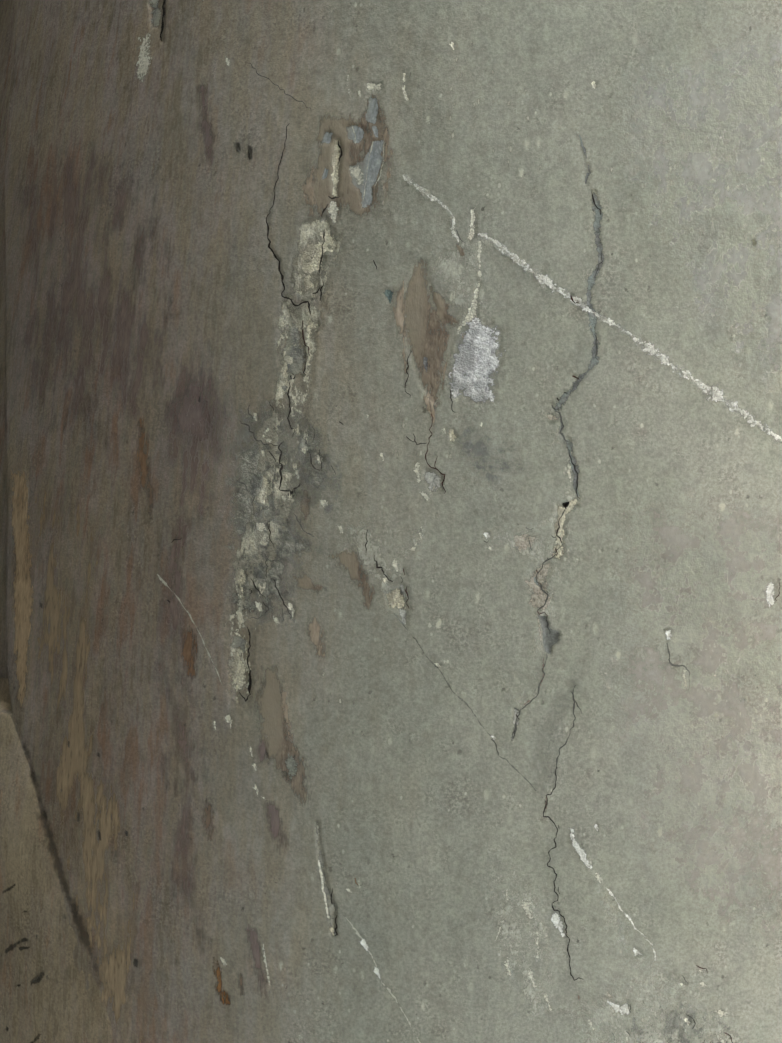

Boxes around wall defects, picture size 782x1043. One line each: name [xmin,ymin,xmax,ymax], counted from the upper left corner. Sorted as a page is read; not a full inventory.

spalling [136,0,166,82]
peeling [297,82,384,301]
crack [547,134,604,499]
peeling [227,315,328,624]
crack [406,397,457,494]
crack [536,547,561,613]
spalling [229,627,252,702]
crack [511,657,548,744]
crack [665,630,690,690]
crack [543,685,582,981]